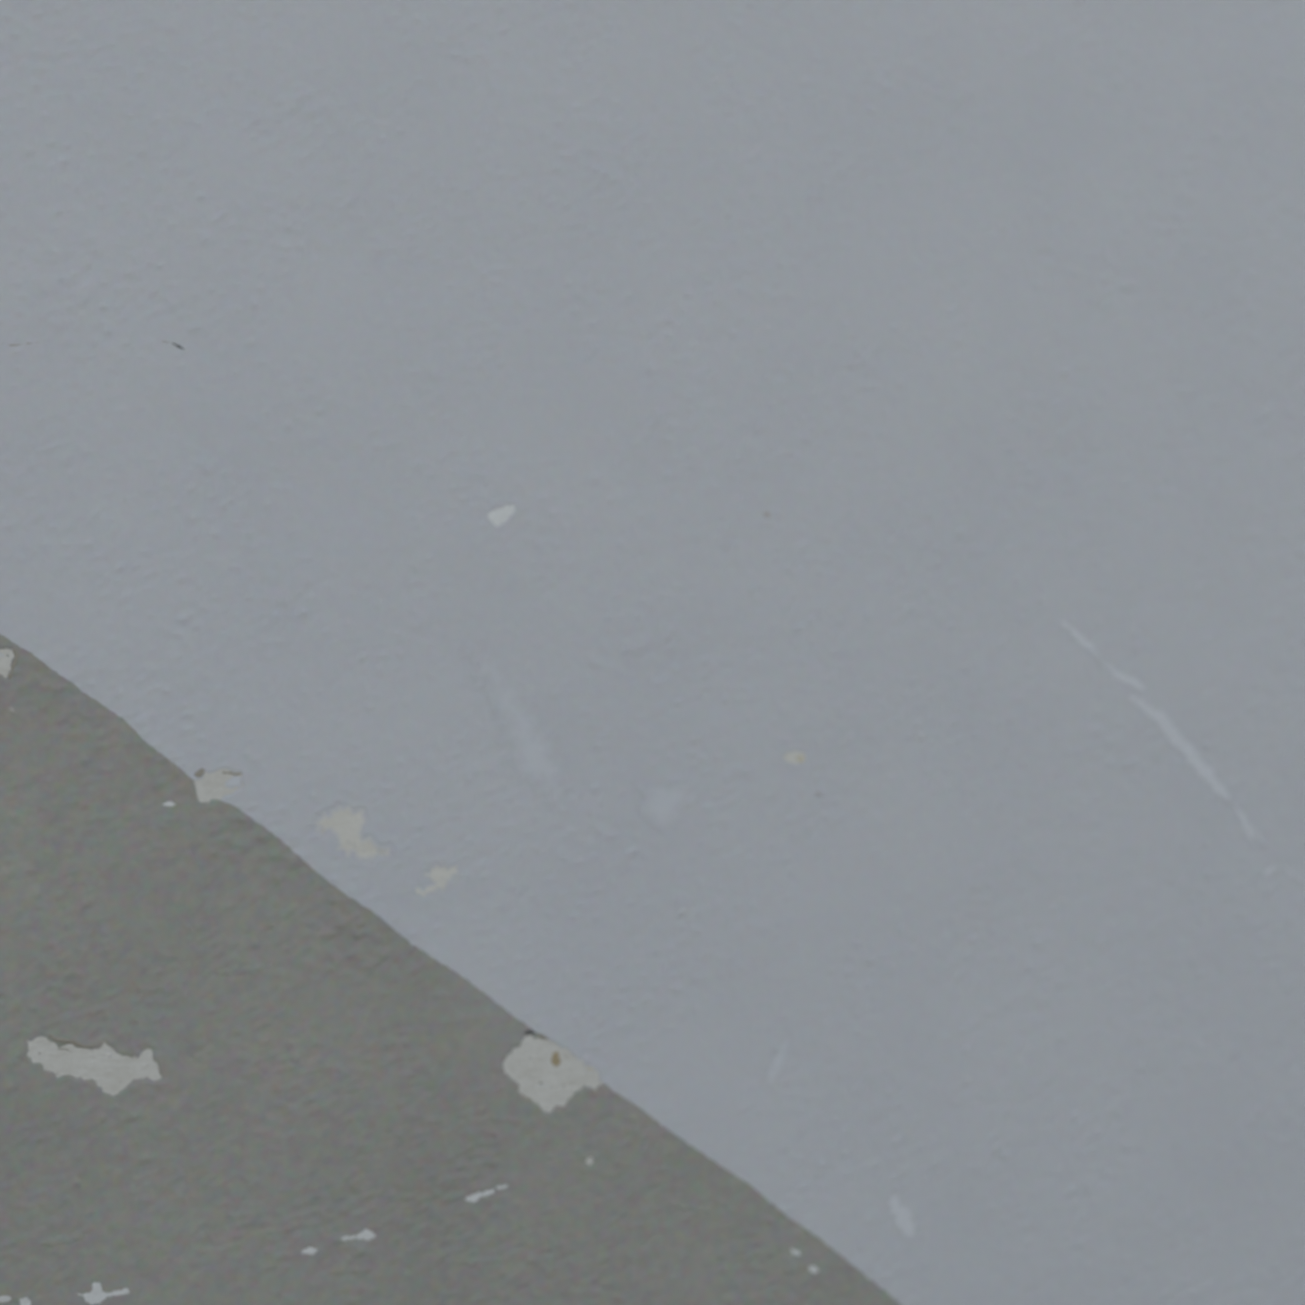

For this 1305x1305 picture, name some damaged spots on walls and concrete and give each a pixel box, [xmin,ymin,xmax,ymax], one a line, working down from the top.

peeling [0,648,18,679]
peeling [194,768,244,803]
peeling [27,1034,161,1096]
peeling [503,1029,605,1112]
peeling [77,1282,129,1305]